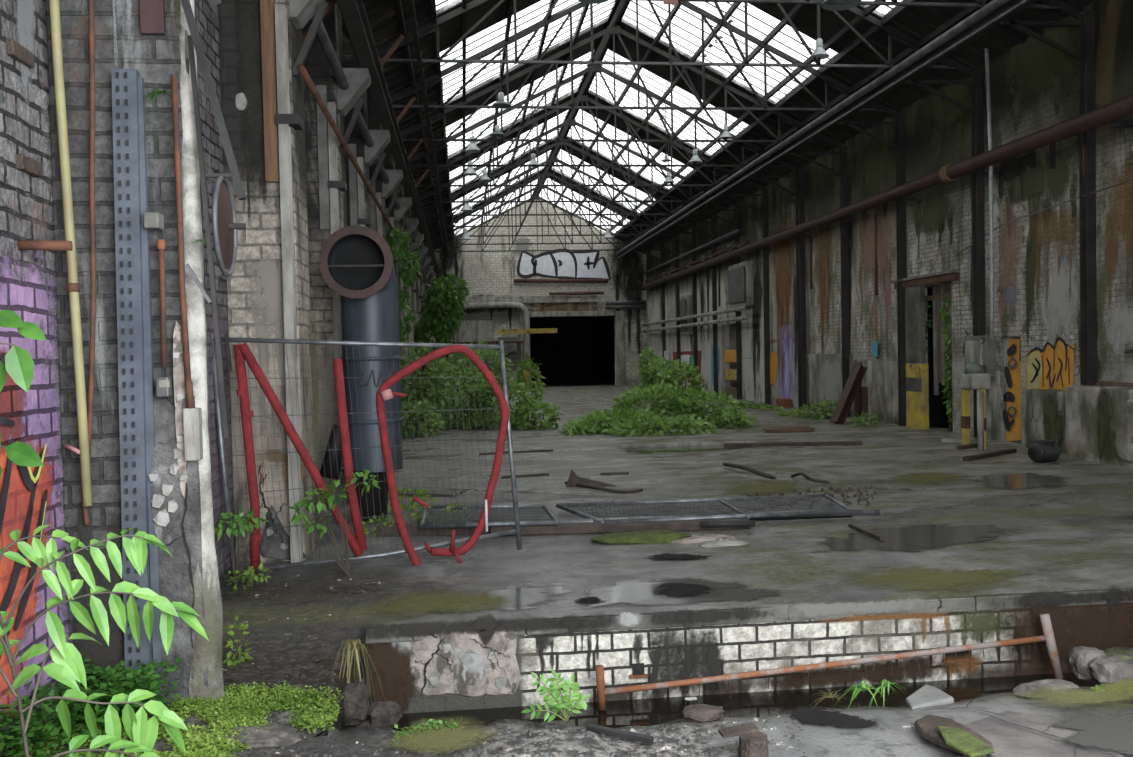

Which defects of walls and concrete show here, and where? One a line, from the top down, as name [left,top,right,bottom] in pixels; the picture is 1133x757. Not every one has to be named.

rust [773,226,793,376]
leakage [993,150,1037,240]
rust [1106,162,1133,313]
crack [393,623,511,694]